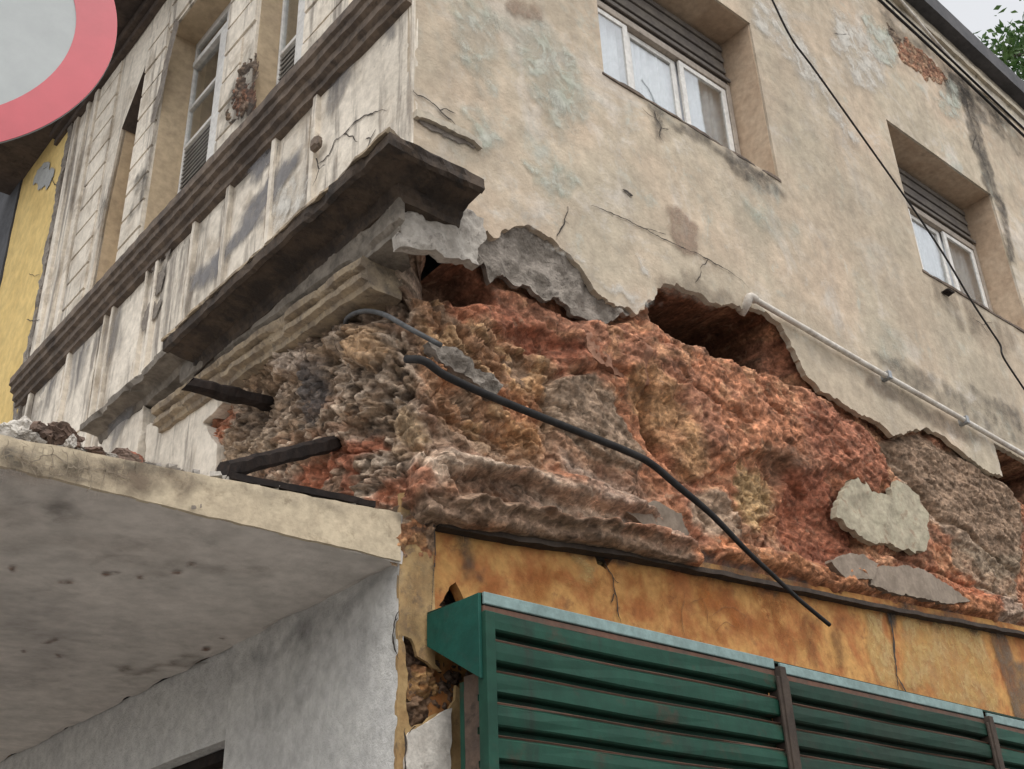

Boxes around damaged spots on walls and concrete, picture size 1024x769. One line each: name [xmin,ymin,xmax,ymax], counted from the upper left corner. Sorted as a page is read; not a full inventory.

spalling [225,53,259,125]
crack [315,109,386,181]
crack [413,90,456,125]
peeling [753,0,825,94]
spalling [832,14,961,117]
leakage [947,69,1014,261]
spalling [22,123,74,364]
crack [592,189,748,287]
spalling [211,208,1024,627]
crack [605,564,622,624]
crack [890,614,906,691]
peeling [403,638,470,769]